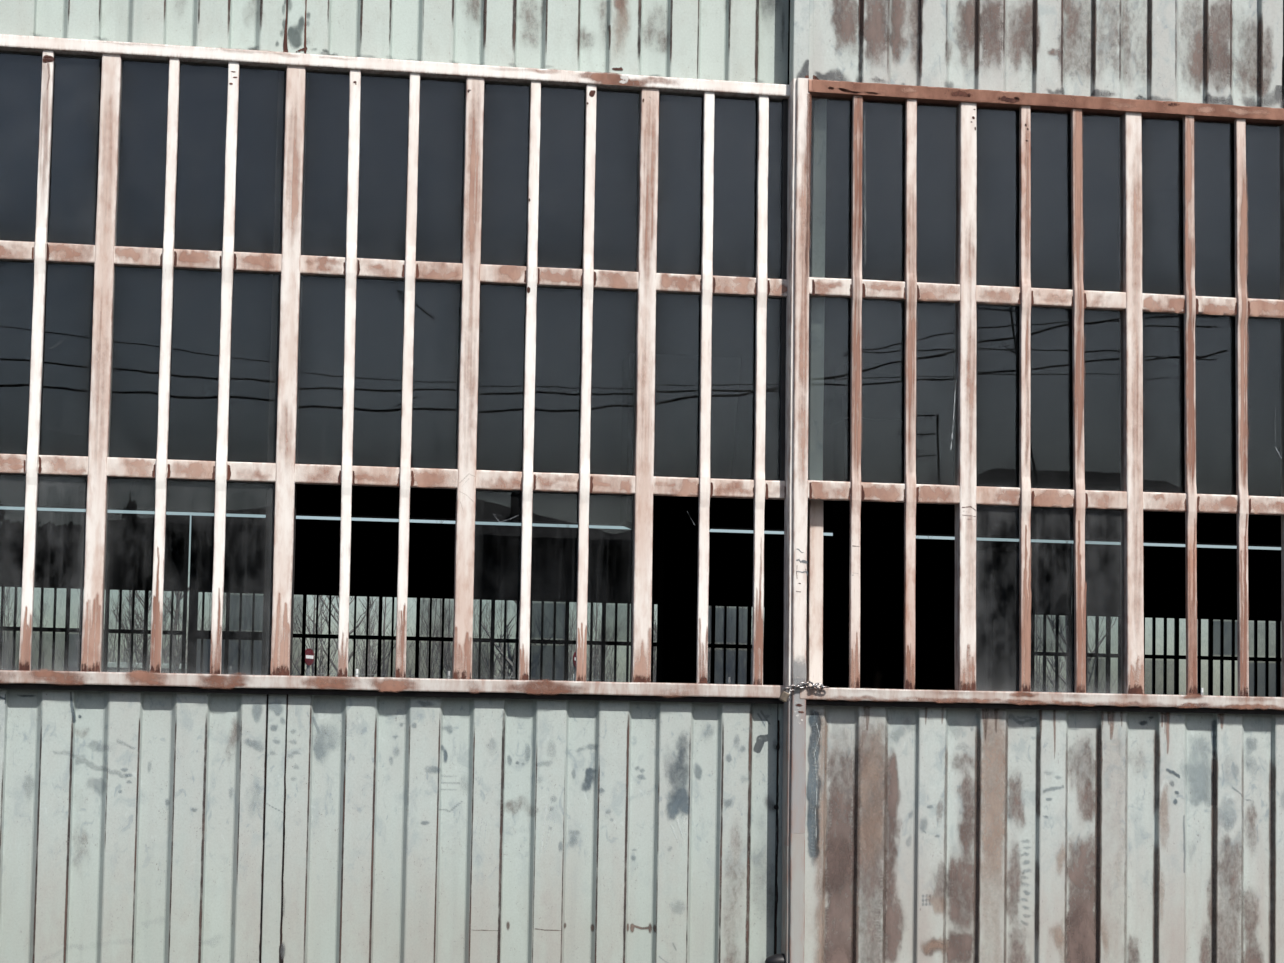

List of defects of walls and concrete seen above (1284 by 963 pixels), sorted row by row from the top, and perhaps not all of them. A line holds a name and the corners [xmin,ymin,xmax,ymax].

corrosion [755,0,775,83]
corrosion [499,265,628,289]
corrosion [661,273,788,295]
corrosion [798,0,1284,809]
corrosion [129,459,231,480]
corrosion [311,468,446,487]
corrosion [659,479,768,499]
corrosion [753,567,763,685]
corrosion [905,490,1144,963]
corrosion [816,632,903,963]
corrosion [1129,849,1160,963]
corrosion [1201,757,1276,963]